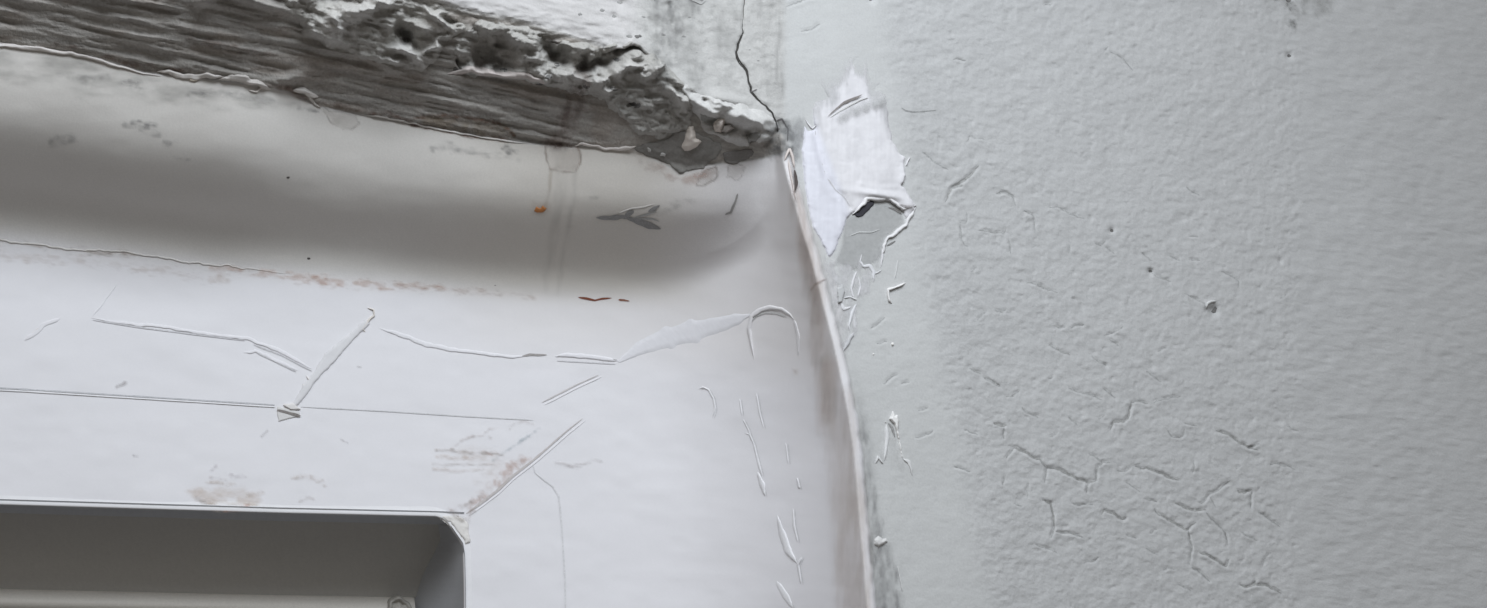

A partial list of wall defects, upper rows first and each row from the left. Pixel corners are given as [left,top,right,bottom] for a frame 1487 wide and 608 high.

spalling [283,0,780,174]
crack [735,0,789,141]
peeling [784,148,798,199]
crack [871,135,1298,593]